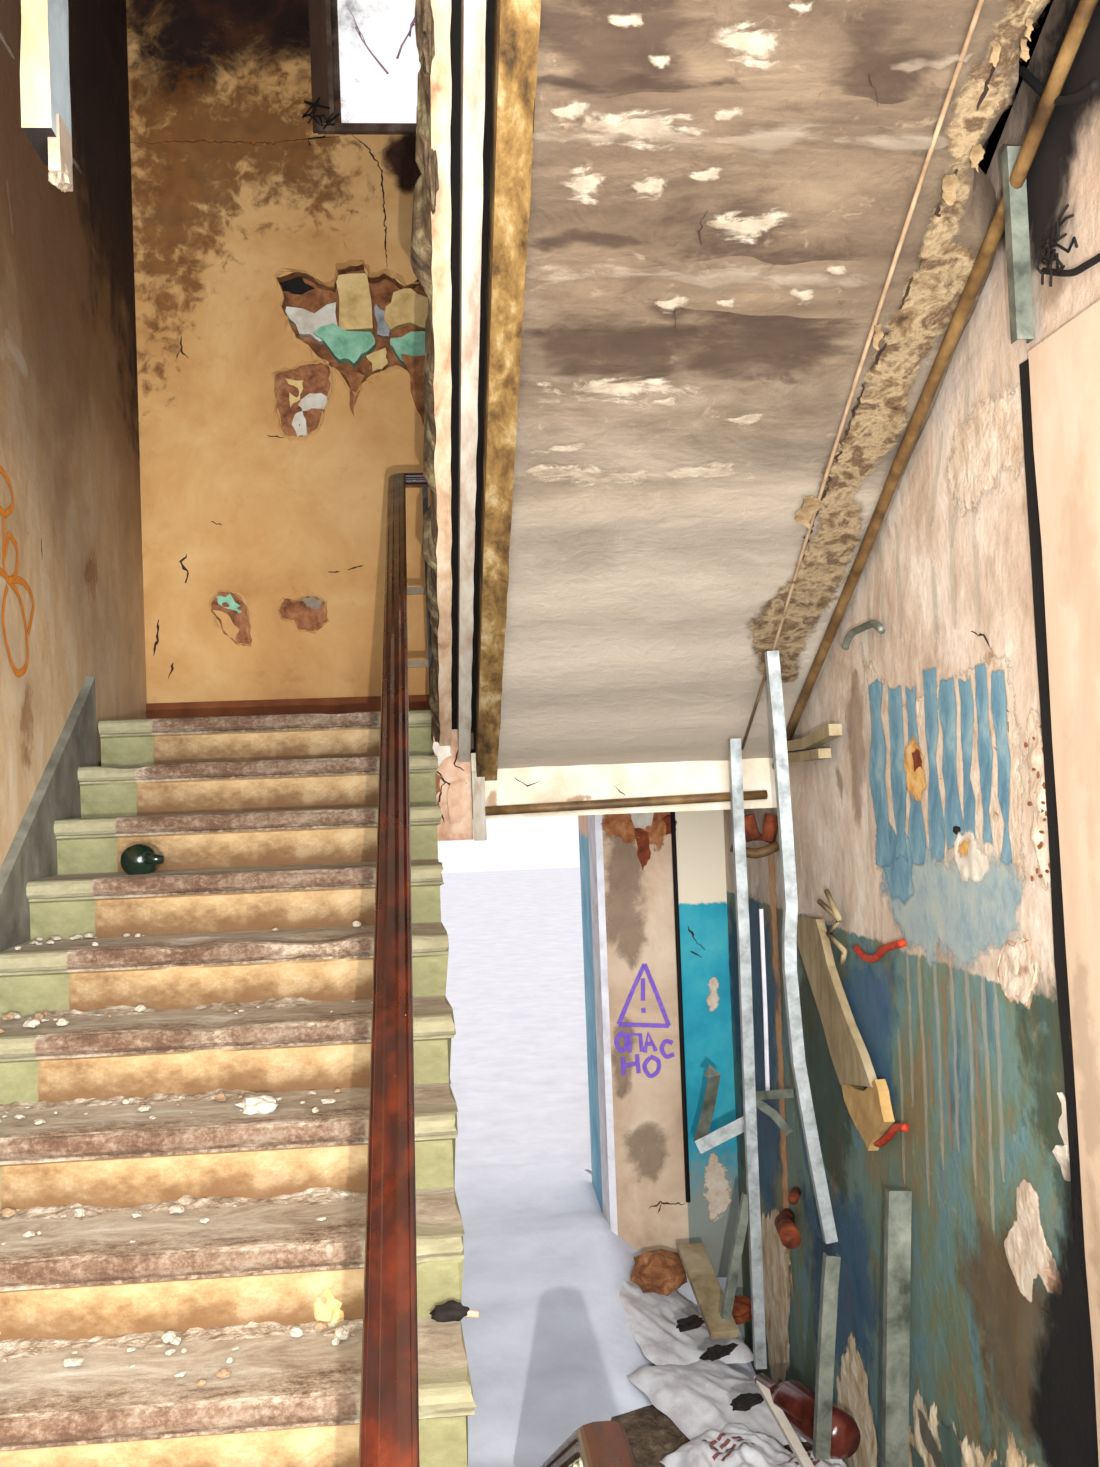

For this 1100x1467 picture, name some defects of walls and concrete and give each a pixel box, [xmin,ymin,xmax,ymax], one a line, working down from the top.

leakage [540,0,691,94]
leakage [845,21,928,104]
leakage [129,64,358,347]
leakage [535,306,836,379]
flaking render [748,0,1049,683]
flaking render [271,0,469,825]
leakage [596,835,644,967]
flaking render [601,812,677,871]
peeling [862,651,1051,1009]
leakage [628,1124,665,1179]
peeling [1004,1179,1057,1302]
flaking render [908,1389,1035,1467]